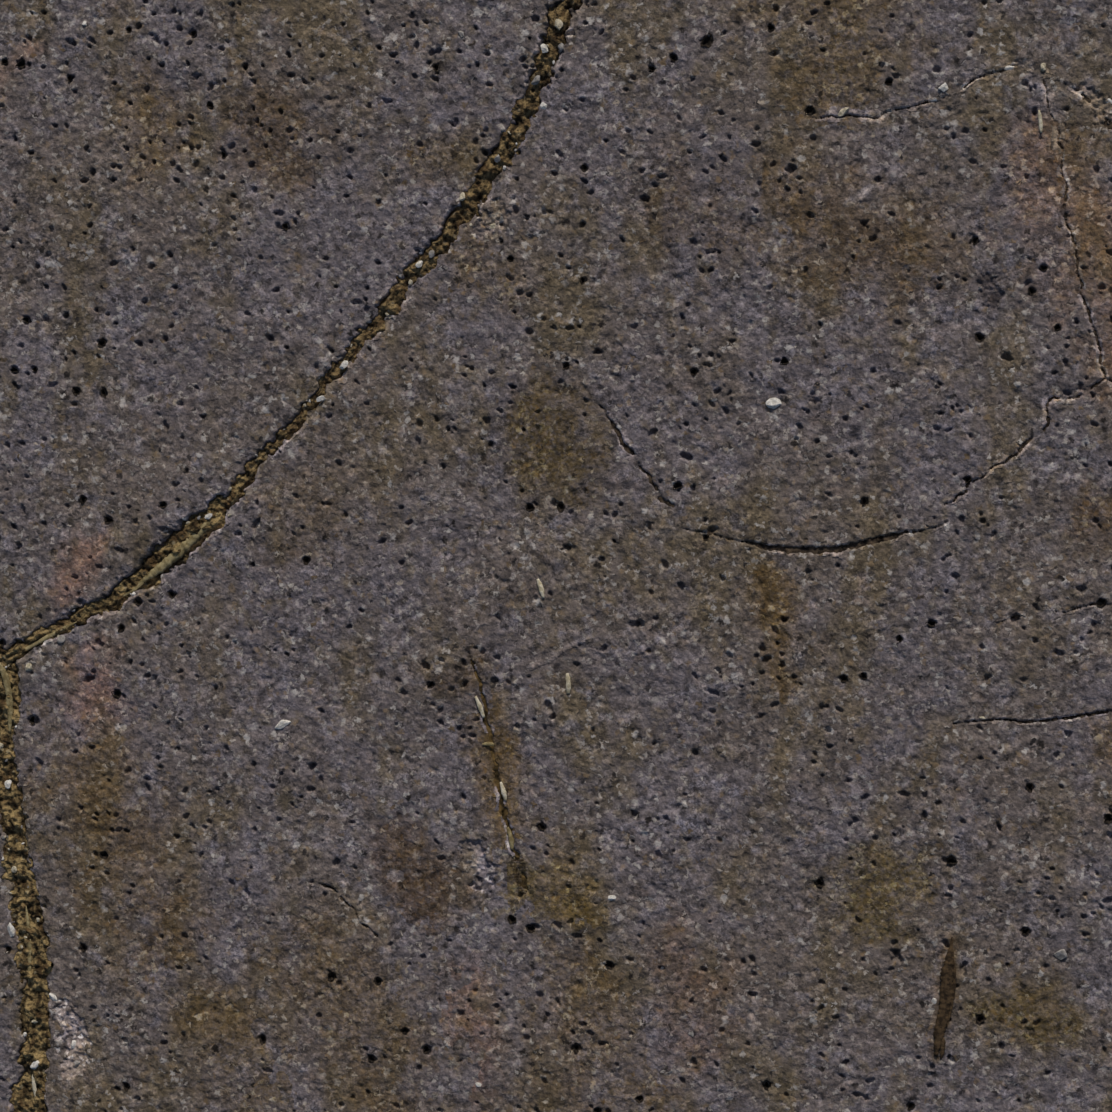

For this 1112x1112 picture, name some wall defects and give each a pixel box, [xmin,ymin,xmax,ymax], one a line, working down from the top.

crack [0,0,583,1112]
crack [599,61,1112,557]
crack [953,710,1110,726]